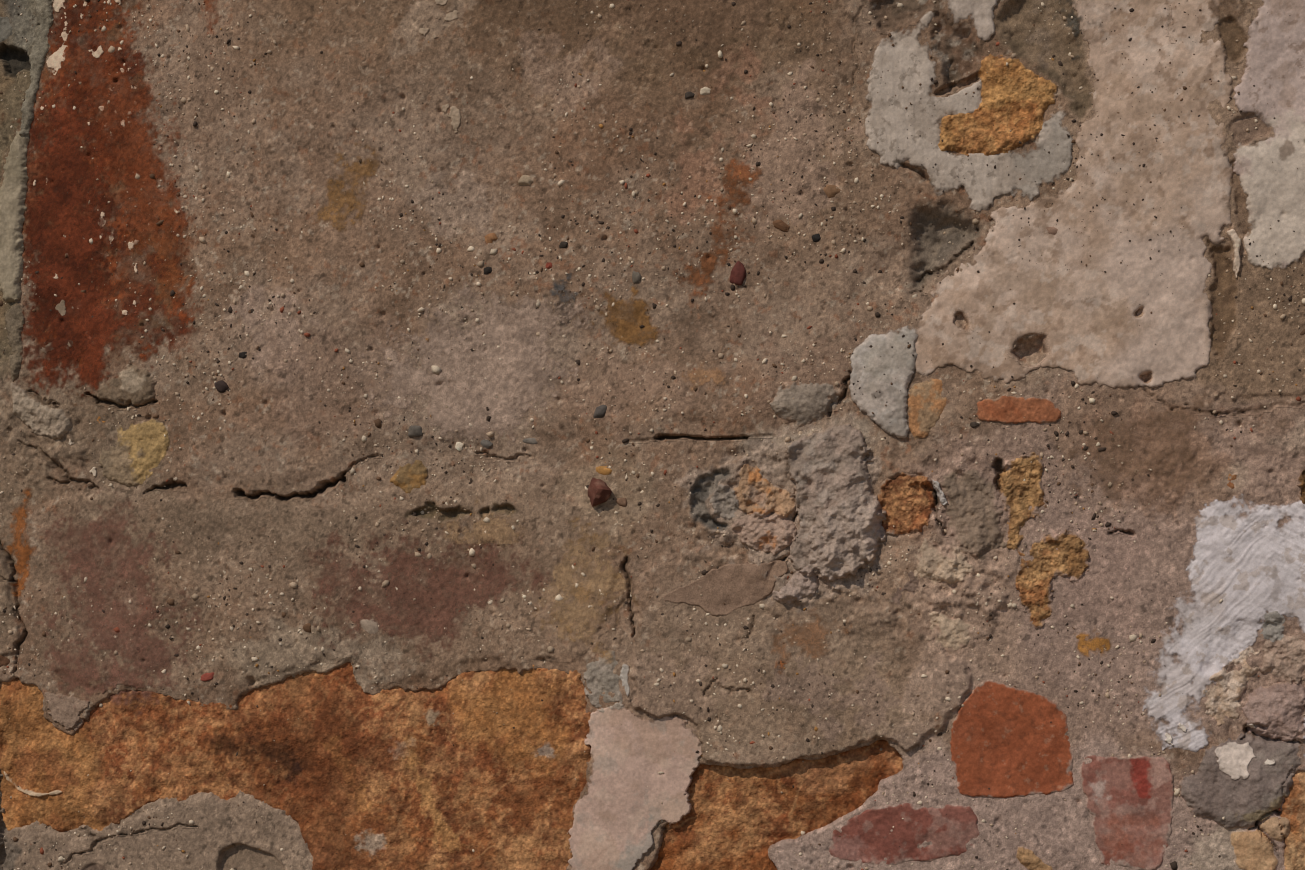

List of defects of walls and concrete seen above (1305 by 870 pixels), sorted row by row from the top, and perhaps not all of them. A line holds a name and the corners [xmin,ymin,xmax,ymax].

rust [18,0,201,405]
peeling [849,0,1305,438]
crack [627,433,776,443]
crack [231,454,384,504]
peeling [1214,724,1275,780]
spalling [78,858,110,870]
spalling [215,841,288,870]